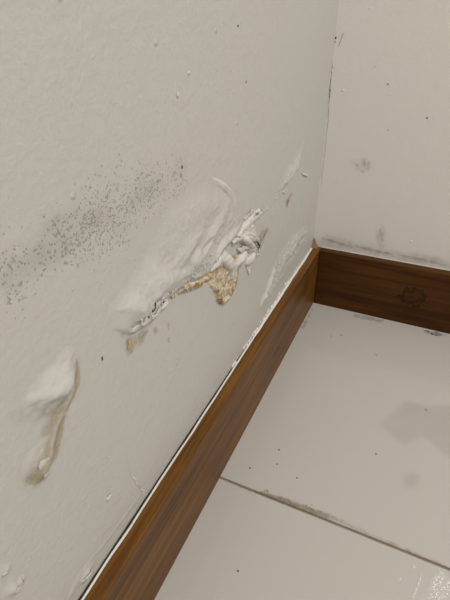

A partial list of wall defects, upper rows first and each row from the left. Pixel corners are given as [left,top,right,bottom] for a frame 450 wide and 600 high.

water stain [0,158,186,313]
spalling [170,208,265,306]